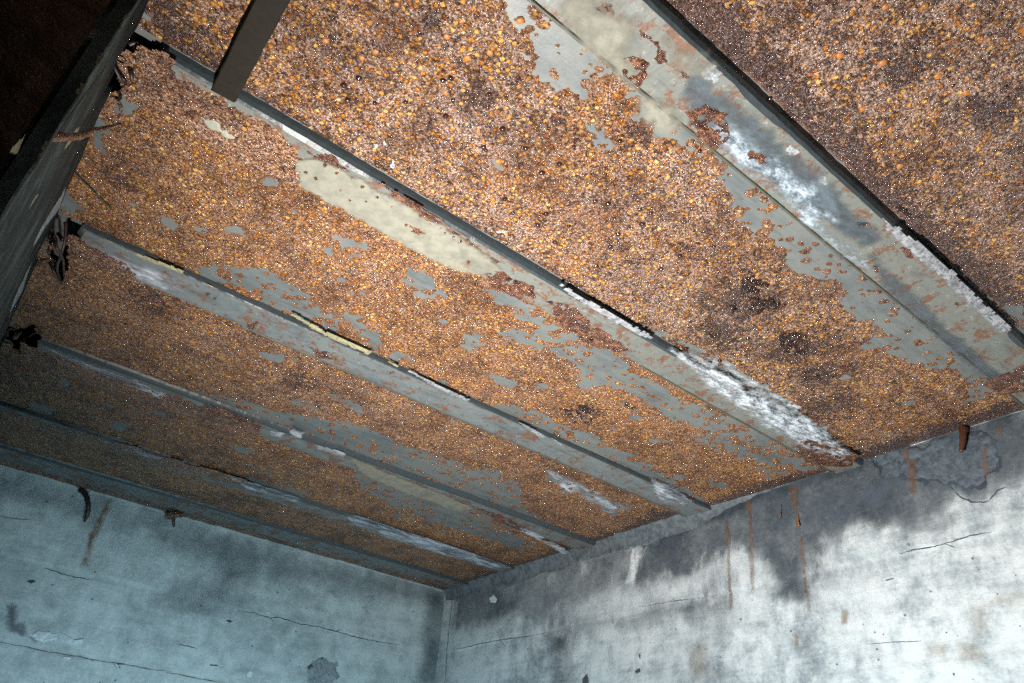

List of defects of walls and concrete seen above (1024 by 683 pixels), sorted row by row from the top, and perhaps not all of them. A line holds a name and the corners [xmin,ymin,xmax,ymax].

peeling [106,239,184,274]
peeling [295,160,501,274]
corrosion [59,0,1024,505]
leakage [720,131,869,268]
peeling [291,314,371,355]
corrosion [0,234,678,590]
peeling [388,361,470,401]
peeling [559,284,653,339]
peeling [670,350,746,395]
leakage [680,353,847,457]
leakage [638,412,1024,598]
crack [900,533,984,554]